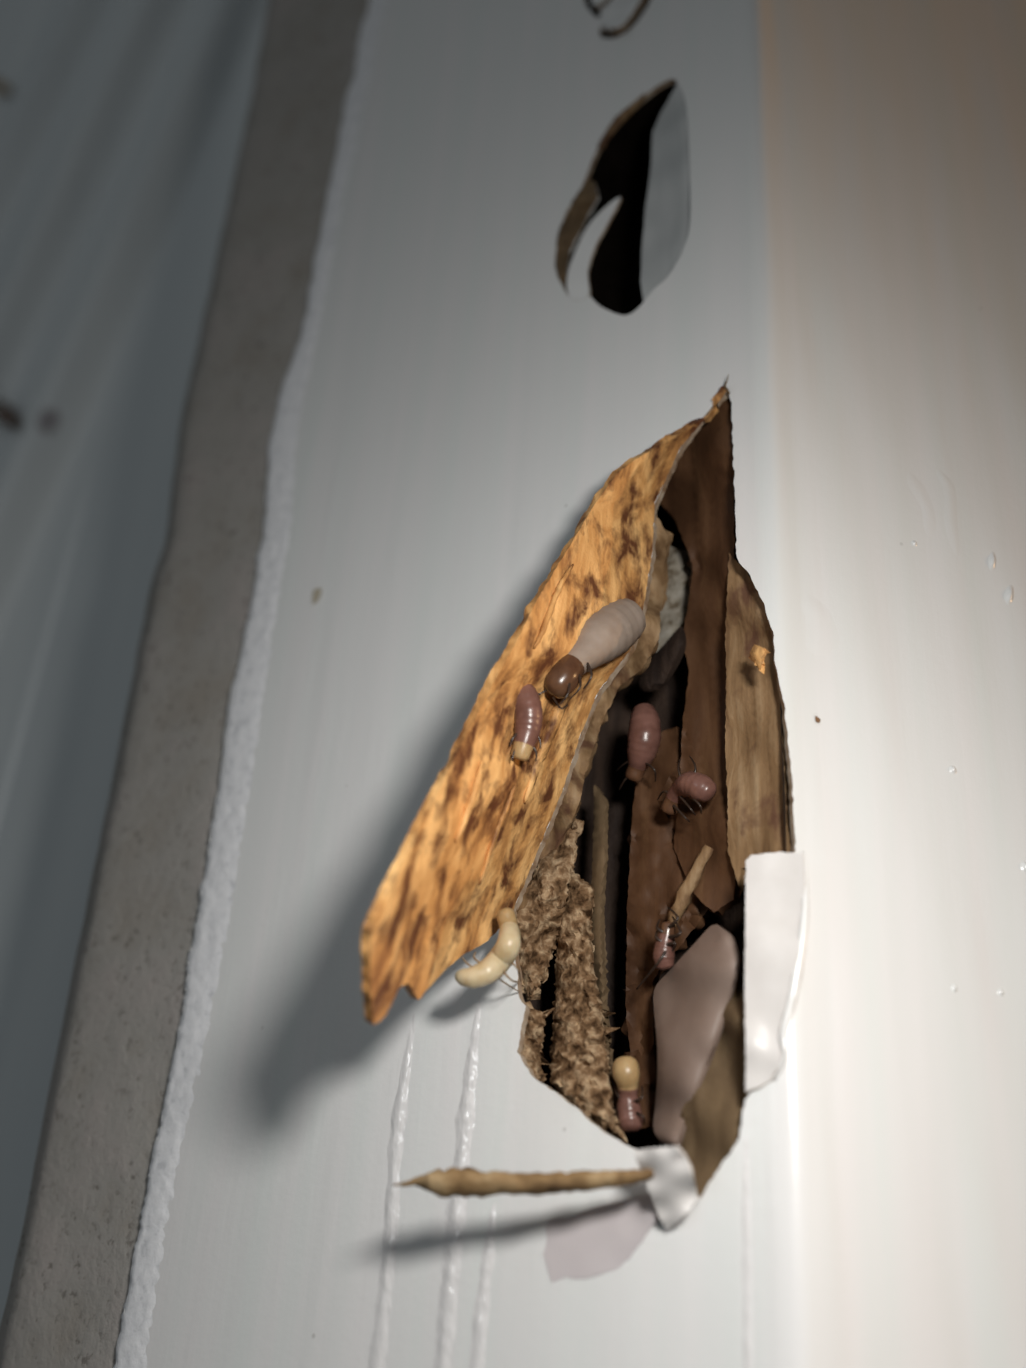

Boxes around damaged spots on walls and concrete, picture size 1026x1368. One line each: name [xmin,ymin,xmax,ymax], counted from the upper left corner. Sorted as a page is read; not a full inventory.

peeling [640,83,691,302]
peeling [748,644,771,674]
peeling [745,852,806,1093]
peeling [633,1146,699,1231]